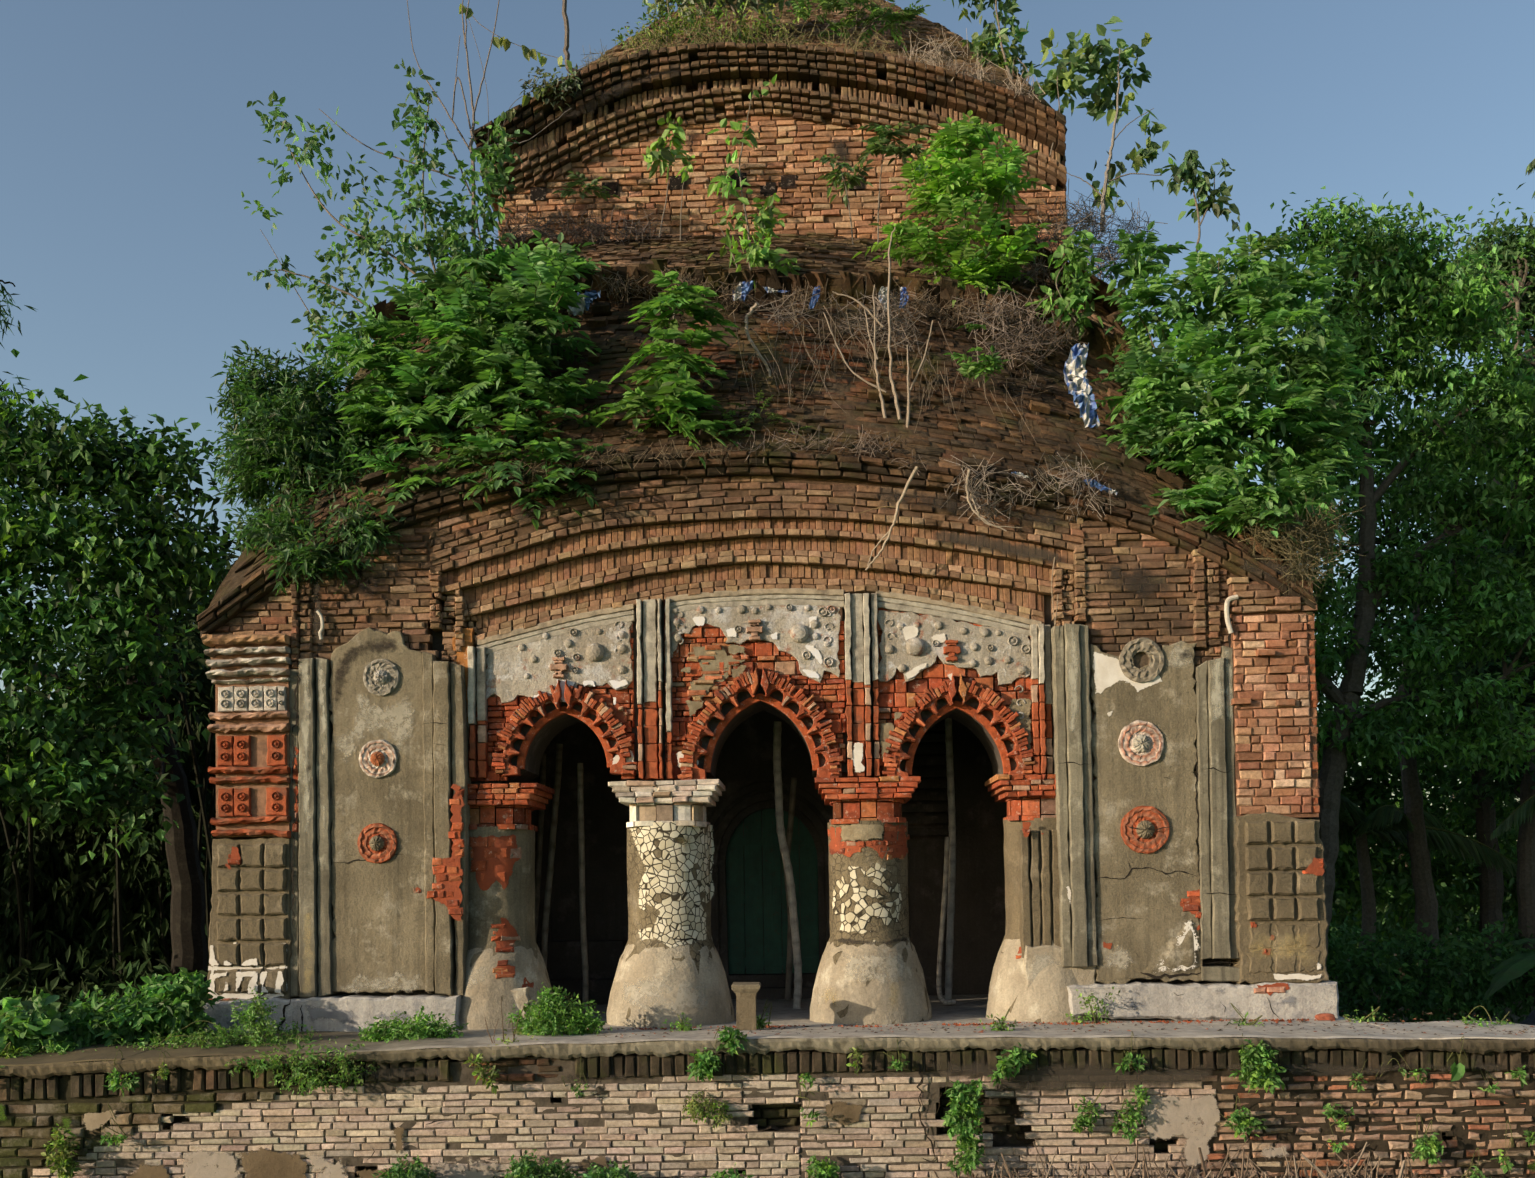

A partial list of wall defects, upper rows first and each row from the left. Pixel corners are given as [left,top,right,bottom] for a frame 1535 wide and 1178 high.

spalling [681,628,749,717]
peeling [802,616,823,679]
peeling [905,663,927,679]
peeling [903,626,946,644]
peeling [1093,652,1162,694]
spalling [512,680,628,726]
spalling [851,712,902,773]
spalling [1007,698,1032,751]
spalling [413,784,522,922]
crack [1097,728,1238,957]
spalling [1180,889,1202,930]
spalling [748,1104,802,1131]